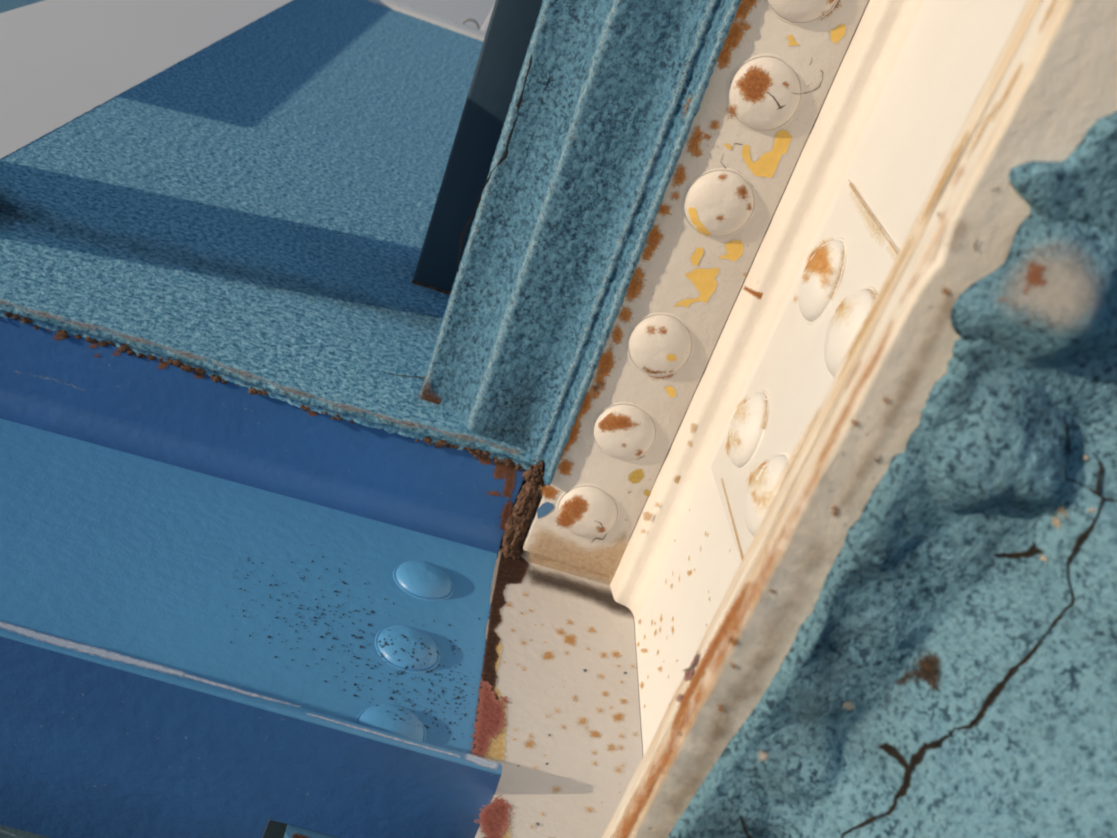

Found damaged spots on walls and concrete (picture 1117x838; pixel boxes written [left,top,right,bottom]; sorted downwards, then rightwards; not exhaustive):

rust [717,0,756,69]
rust [687,66,789,157]
rust [4,312,269,396]
rust [419,376,441,405]
rust [558,165,686,475]
rust [743,273,763,299]
rust [803,242,846,315]
rust [415,437,589,750]
crack [841,421,1117,838]
rust [616,555,775,838]
peeling [473,795,515,838]
crack [740,817,751,838]